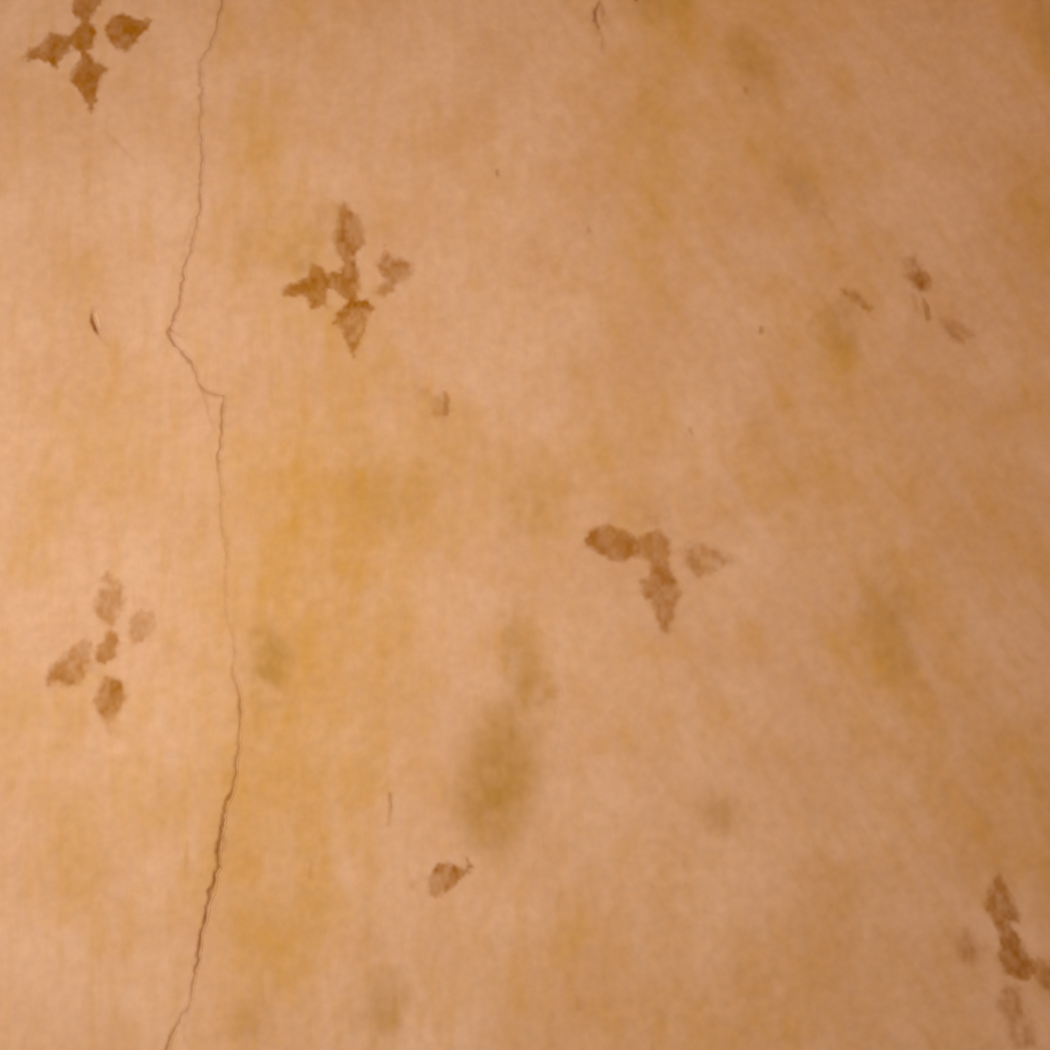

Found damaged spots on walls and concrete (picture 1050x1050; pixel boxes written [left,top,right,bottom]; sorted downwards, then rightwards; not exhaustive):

crack [163,0,244,1050]